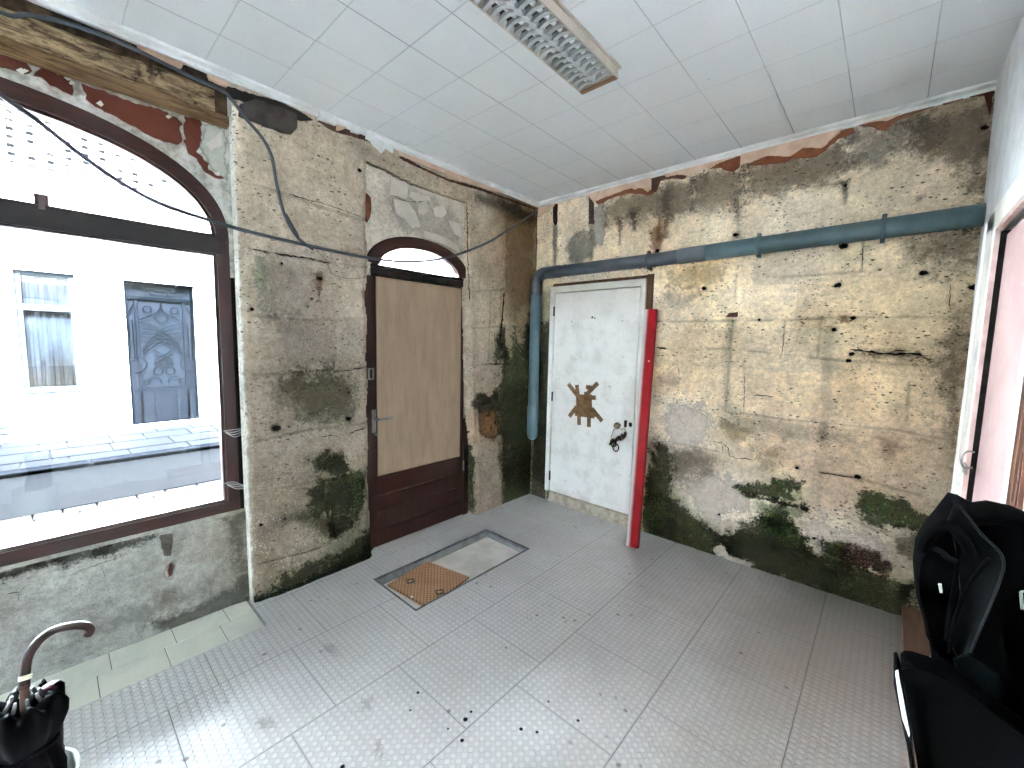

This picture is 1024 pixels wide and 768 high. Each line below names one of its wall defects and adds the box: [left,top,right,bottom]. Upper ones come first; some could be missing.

flaking render [137,44,185,69]
peeling [0,54,228,180]
flaking render [206,74,555,218]
peeling [390,179,463,253]
flaking render [589,90,994,205]
water stain [589,96,995,238]
water stain [909,227,981,281]
crack [850,348,924,356]
water stain [673,472,896,578]